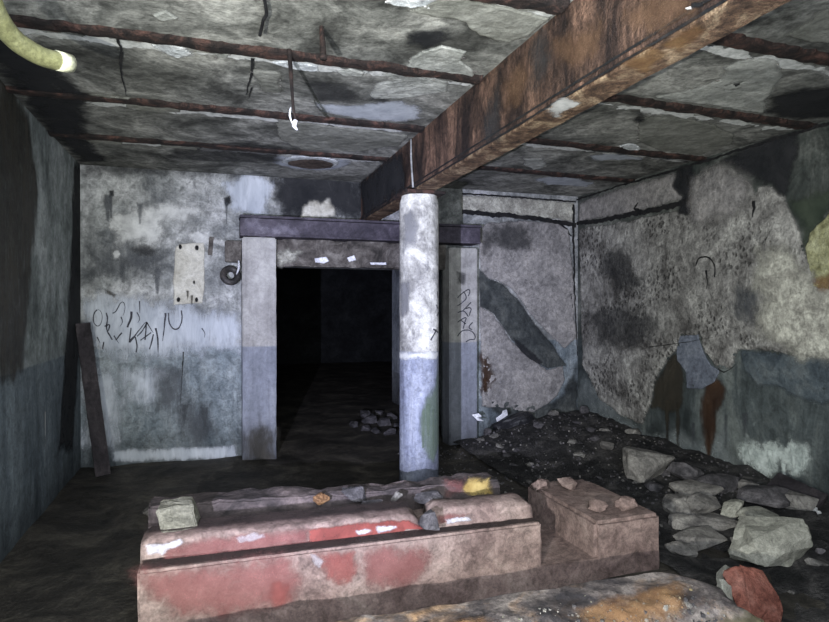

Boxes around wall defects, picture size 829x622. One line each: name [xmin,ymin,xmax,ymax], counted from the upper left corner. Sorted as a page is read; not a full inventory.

peeling [385,0,552,42]
peeling [17,27,478,99]
peeling [86,93,408,162]
corrosion [549,98,579,117]
peeling [524,158,547,170]
leakage [105,191,114,220]
peeling [301,199,335,218]
crack [462,122,829,356]
leakage [89,247,163,289]
flaking render [462,164,829,424]
corrosion [479,355,495,395]
corrosion [700,379,725,455]